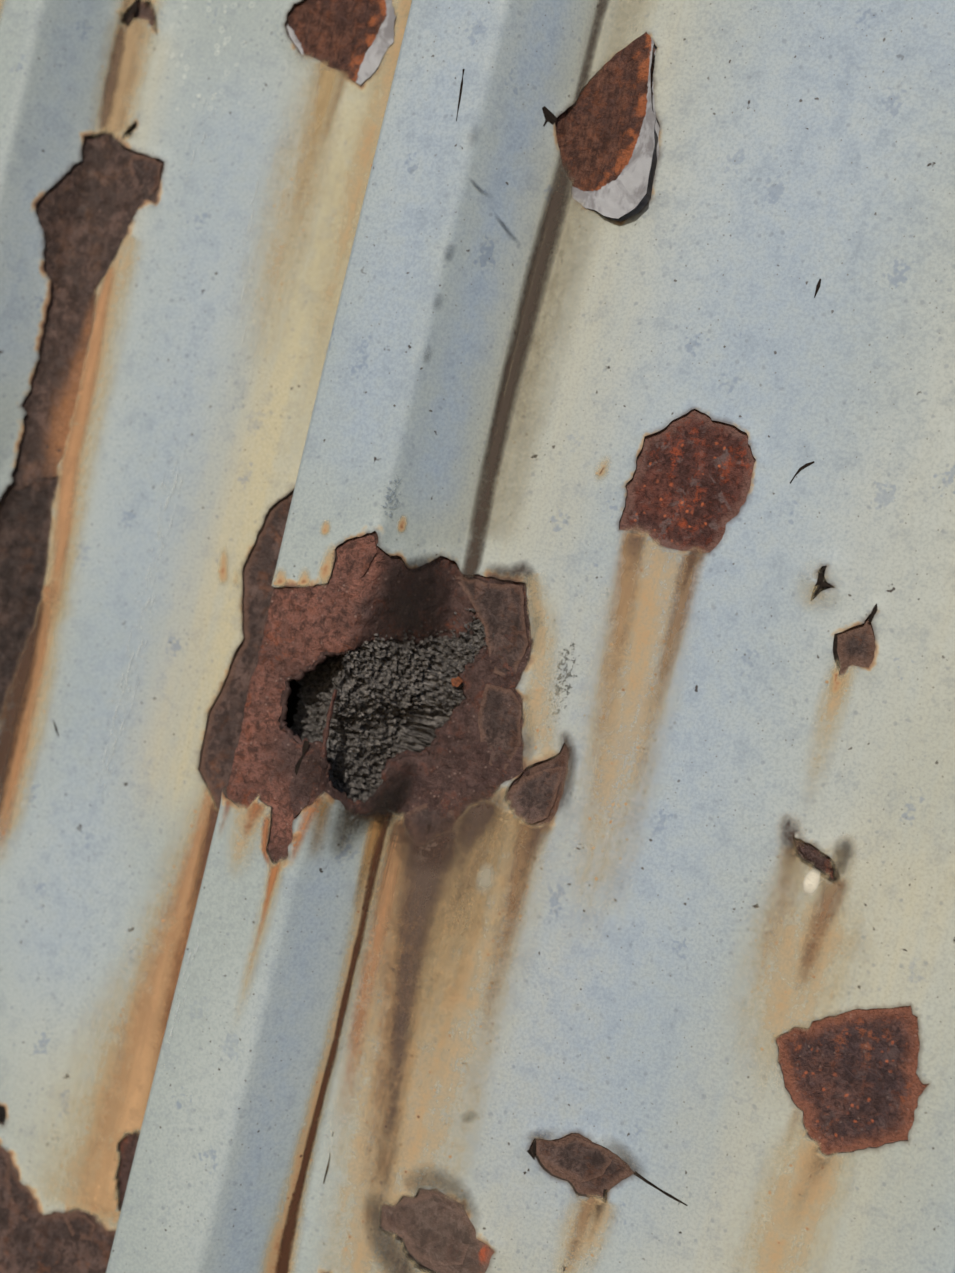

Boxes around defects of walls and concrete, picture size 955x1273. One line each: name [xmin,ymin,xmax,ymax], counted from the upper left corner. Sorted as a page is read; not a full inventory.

rust [0,131,164,836]
rust [0,493,569,1273]
rust [588,409,756,852]
rust [751,820,928,1273]
rust [821,603,877,728]